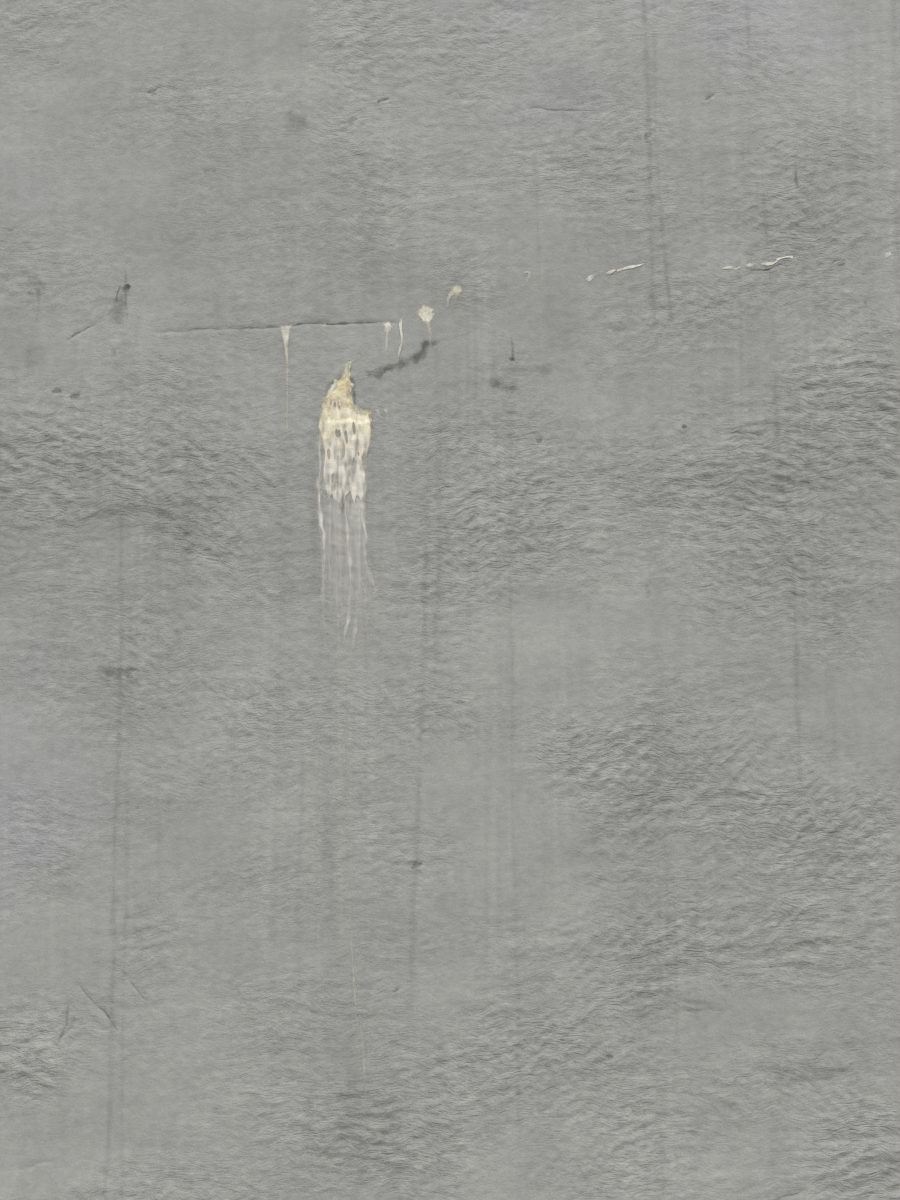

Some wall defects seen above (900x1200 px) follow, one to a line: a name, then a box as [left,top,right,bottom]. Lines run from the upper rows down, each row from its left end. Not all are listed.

damp [317,399,387,597]